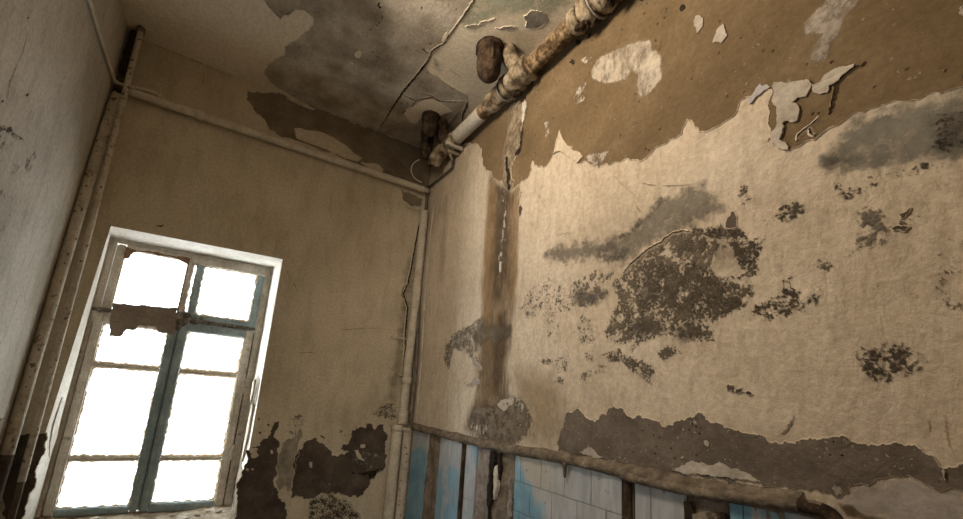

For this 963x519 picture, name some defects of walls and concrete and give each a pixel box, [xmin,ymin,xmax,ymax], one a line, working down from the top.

spalling [246,0,559,207]
crack [378,0,475,132]
flaking render [461,0,963,193]
damp [820,89,963,202]
crack [397,218,420,378]
damp [522,183,820,387]
damp [845,207,919,256]
damp [855,342,927,382]
flaking render [0,397,63,519]
spalling [232,374,388,519]
spalling [683,496,824,519]
spalling [557,406,963,498]